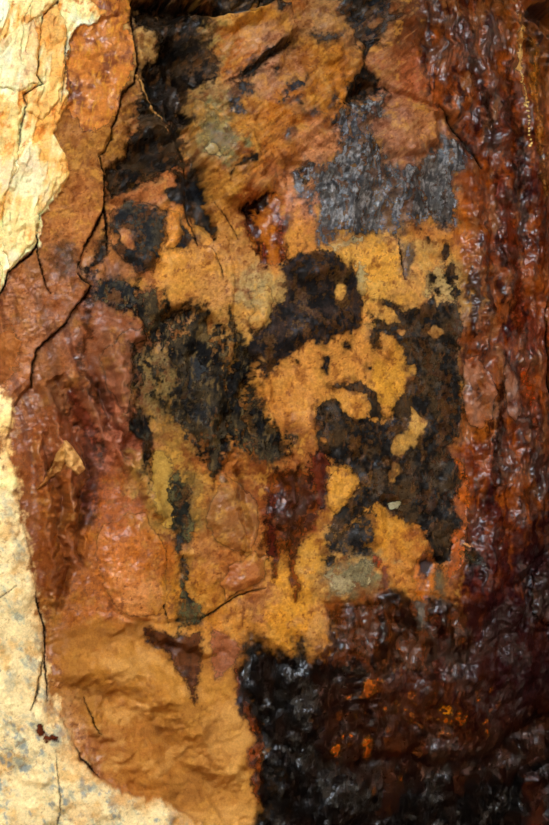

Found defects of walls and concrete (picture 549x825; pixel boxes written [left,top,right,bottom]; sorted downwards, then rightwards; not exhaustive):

crack [19,0,58,145]
crack [30,1,139,386]
leakage [49,0,473,595]
rust [460,18,544,448]
rust [492,381,506,490]
crack [32,597,48,707]
crack [76,748,96,774]